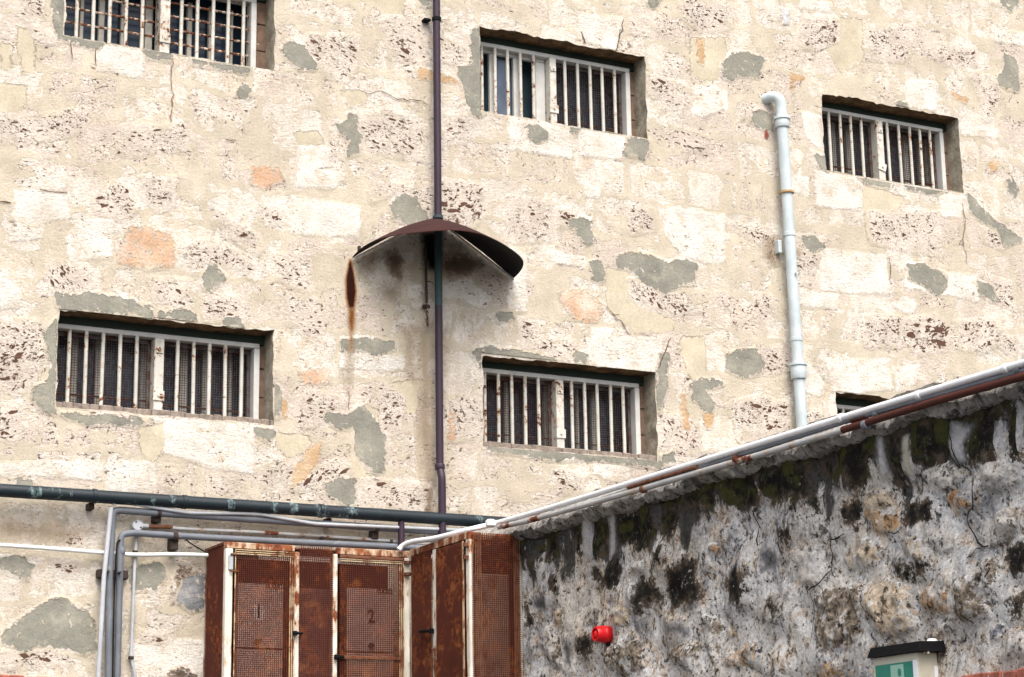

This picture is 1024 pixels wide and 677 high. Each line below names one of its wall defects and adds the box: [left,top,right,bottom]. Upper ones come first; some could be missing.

crack [168,59,176,122]
rust [346,259,357,350]
water stain [386,250,403,294]
water stain [421,231,484,276]
spalling [442,193,665,372]
spalling [791,170,1021,424]
peeling [0,351,434,512]
water stain [520,398,1024,647]
crack [808,502,901,642]
crack [948,429,990,578]